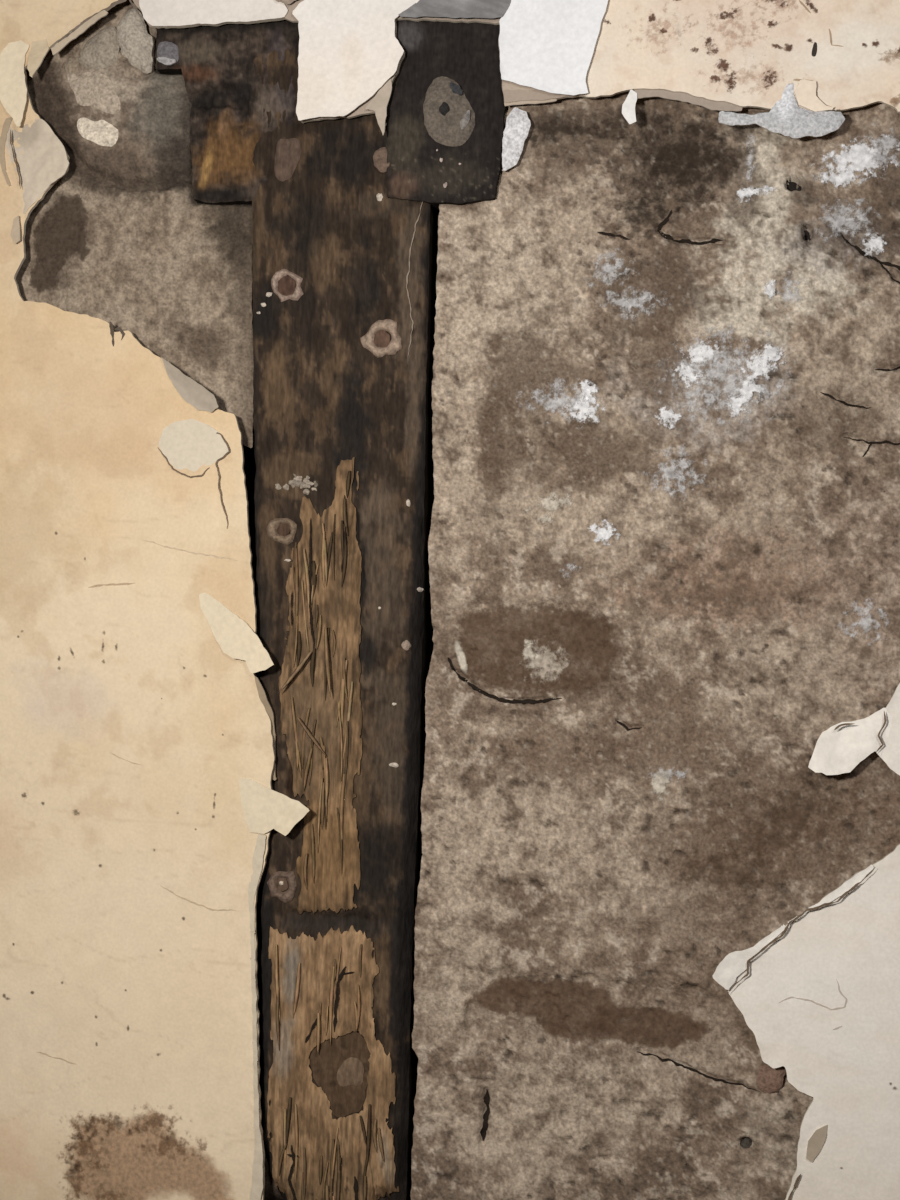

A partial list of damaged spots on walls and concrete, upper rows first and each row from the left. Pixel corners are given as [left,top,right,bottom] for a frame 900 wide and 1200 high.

efflorescence [811,129,900,187]
crack [657,210,722,245]
flaking render [16,0,255,527]
crack [838,231,900,284]
efflorescence [528,380,605,422]
efflorescence [655,325,783,429]
flaking render [410,90,900,1200]
crack [448,658,562,704]
leakage [470,978,706,1047]
crack [639,1052,760,1092]
leakage [64,1113,225,1200]
flaking render [264,1145,284,1200]